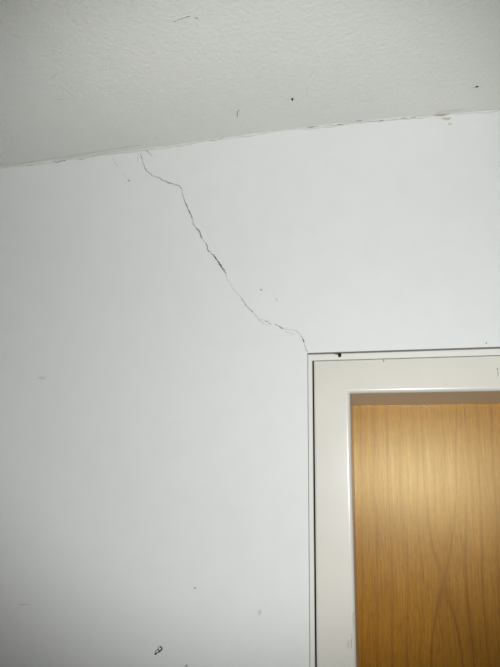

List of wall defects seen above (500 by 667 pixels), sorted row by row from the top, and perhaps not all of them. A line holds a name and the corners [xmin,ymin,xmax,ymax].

crack [3,145,307,351]